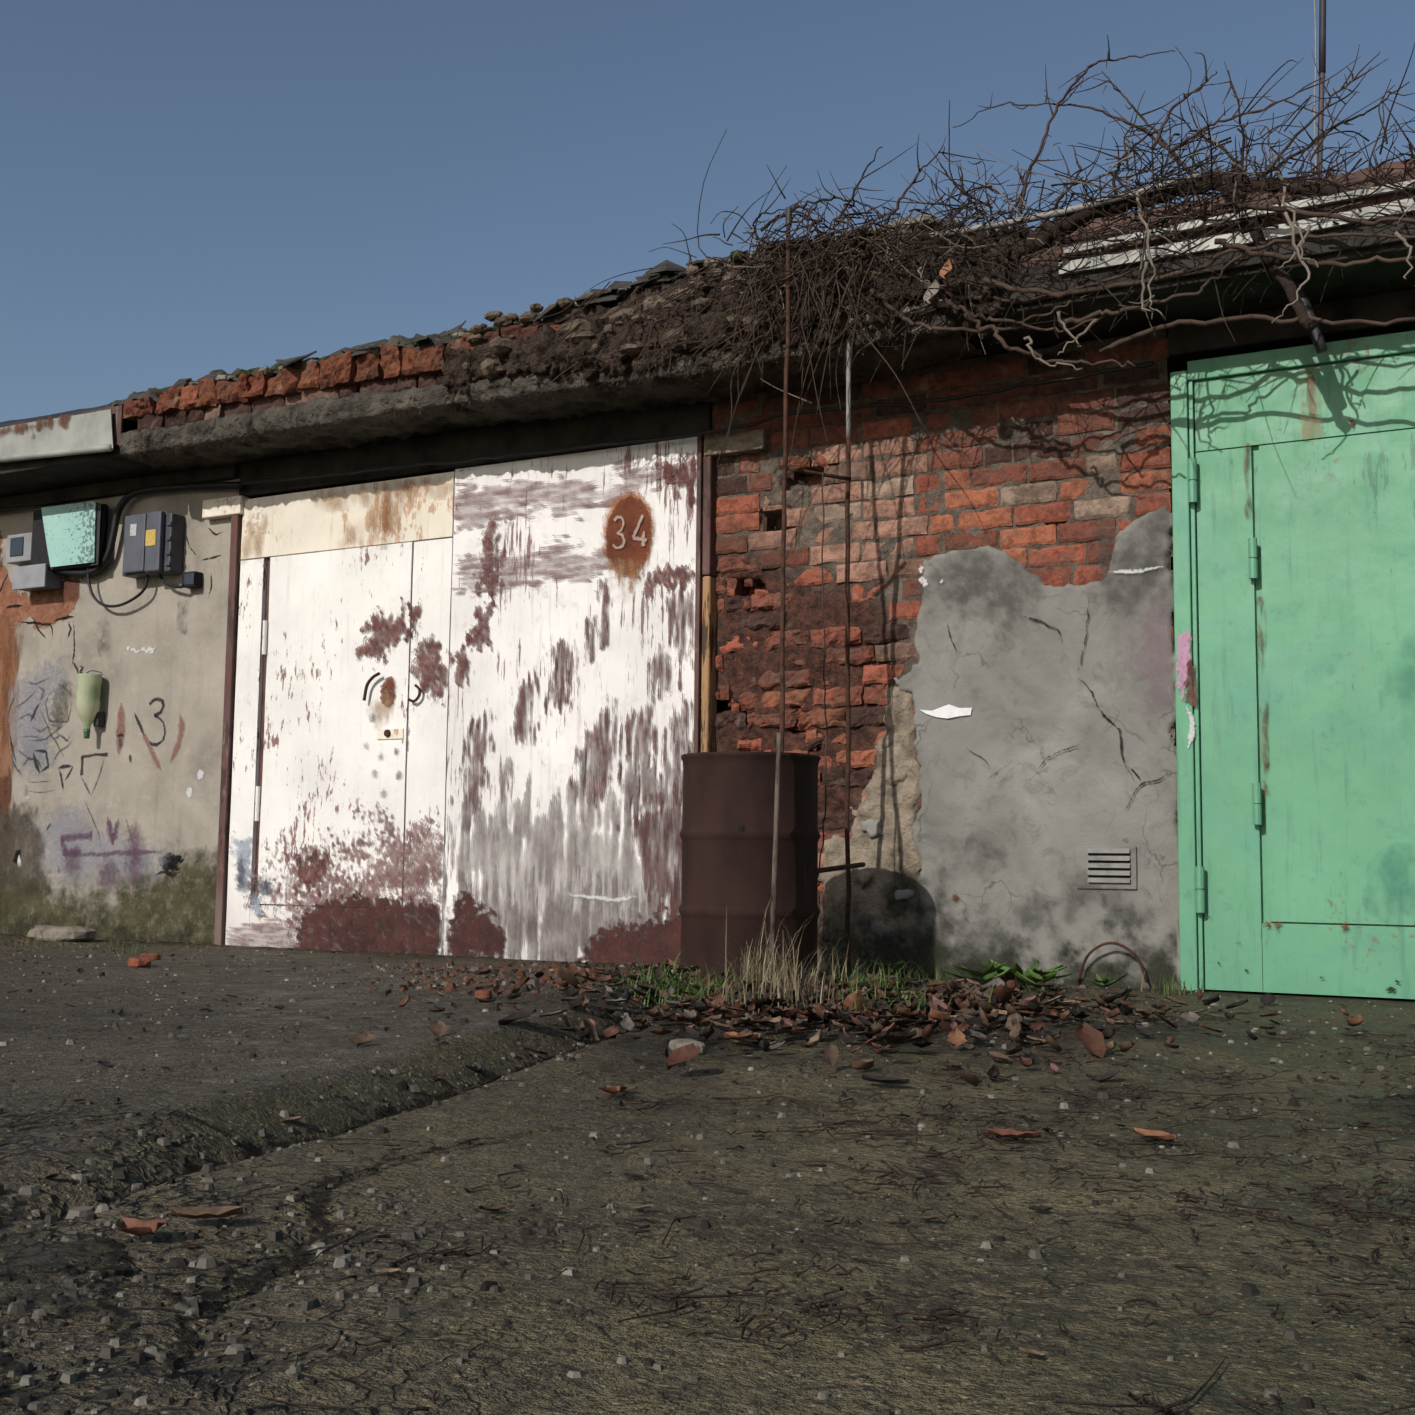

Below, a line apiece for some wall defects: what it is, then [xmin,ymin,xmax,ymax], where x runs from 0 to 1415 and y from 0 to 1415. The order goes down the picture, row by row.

corrosion [0,414,70,435]
corrosion [602,491,654,588]
spalling [763,517,775,532]
spalling [726,578,769,610]
corrosion [0,616,19,819]
corrosion [375,676,395,719]
spalling [791,709,826,751]
crack [1021,603,1171,807]
damp [0,805,218,944]